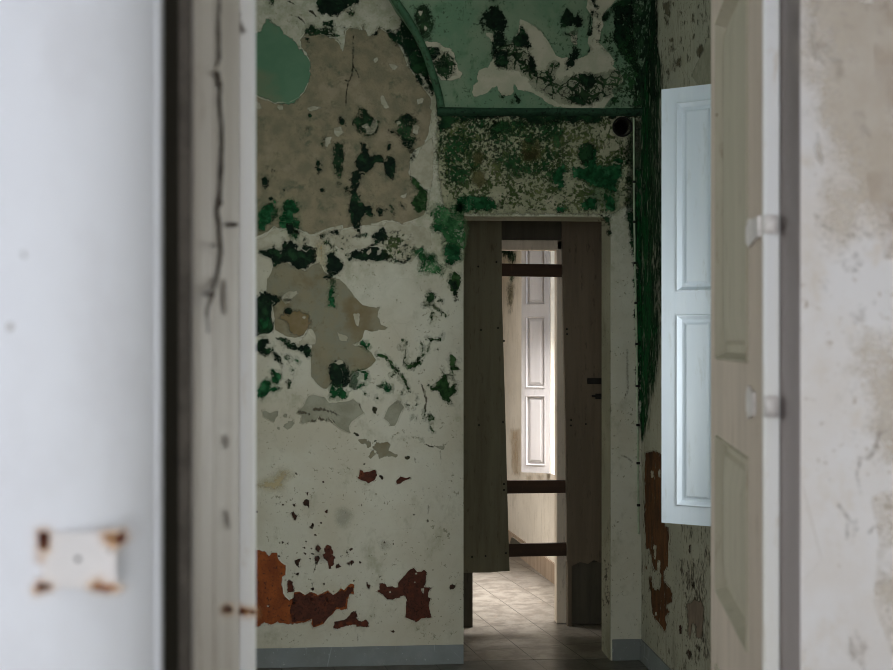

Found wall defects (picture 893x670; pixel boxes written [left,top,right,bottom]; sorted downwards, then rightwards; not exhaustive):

flaking render [256,0,641,264]
water stain [256,0,663,439]
flaking render [261,261,410,485]